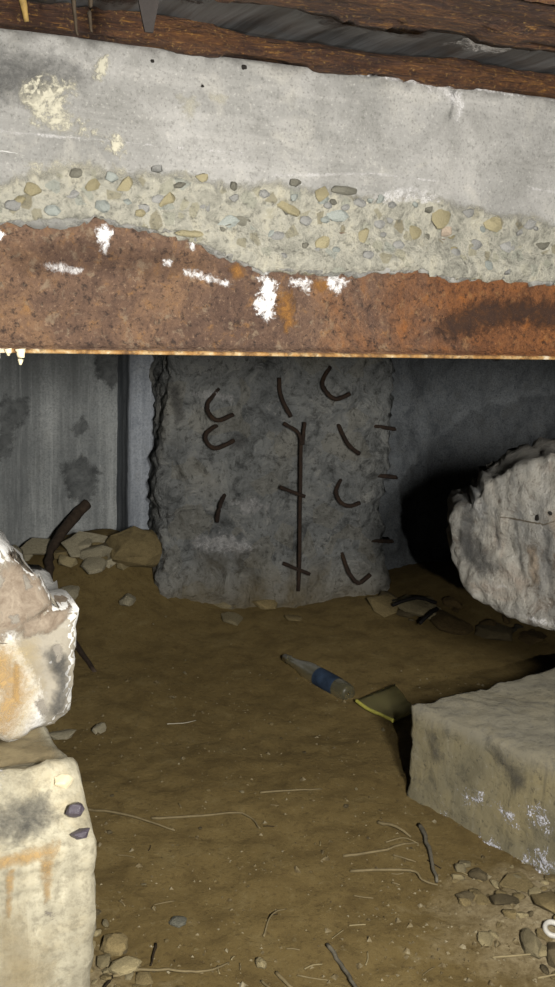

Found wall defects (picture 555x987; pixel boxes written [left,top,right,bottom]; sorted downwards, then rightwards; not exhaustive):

efflorescence [97,225,113,254]
efflorescence [253,277,278,320]
efflorescence [328,277,345,293]
efflorescence [0,348,26,365]
spalling [277,378,311,591]
spalling [0,548,72,641]
leakage [0,803,47,838]
corrosion [0,849,53,910]